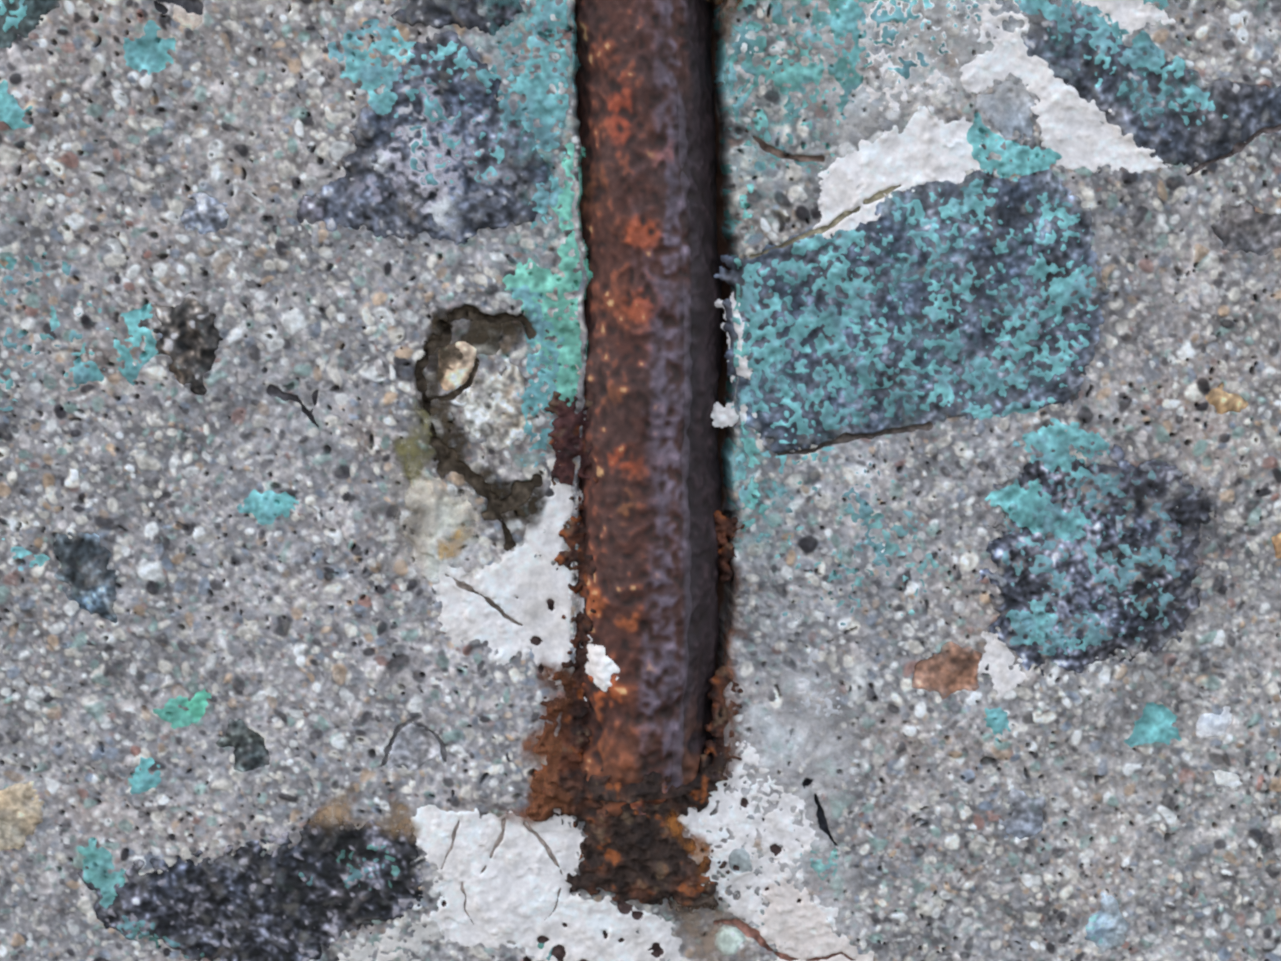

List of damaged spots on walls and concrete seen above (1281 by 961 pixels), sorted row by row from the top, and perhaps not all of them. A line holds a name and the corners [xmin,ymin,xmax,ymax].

peeling [237,489,299,526]
peeling [335,805,682,961]
corrosion [507,391,745,913]
spalling [327,0,1228,817]